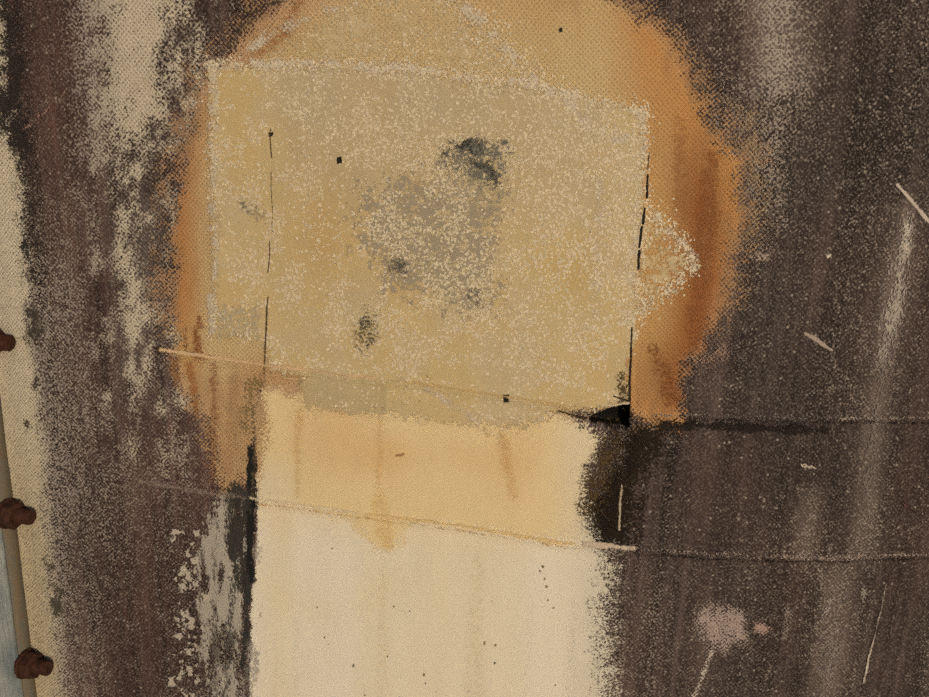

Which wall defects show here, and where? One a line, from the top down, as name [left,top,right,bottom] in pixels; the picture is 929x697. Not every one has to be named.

crack [262,296,270,375]
mould [354,312,379,354]
peeling [199,0,701,439]
corrosion [142,0,776,499]
damp [438,135,513,190]
crack [637,152,650,270]
peeling [168,529,211,697]
damp [189,375,671,697]